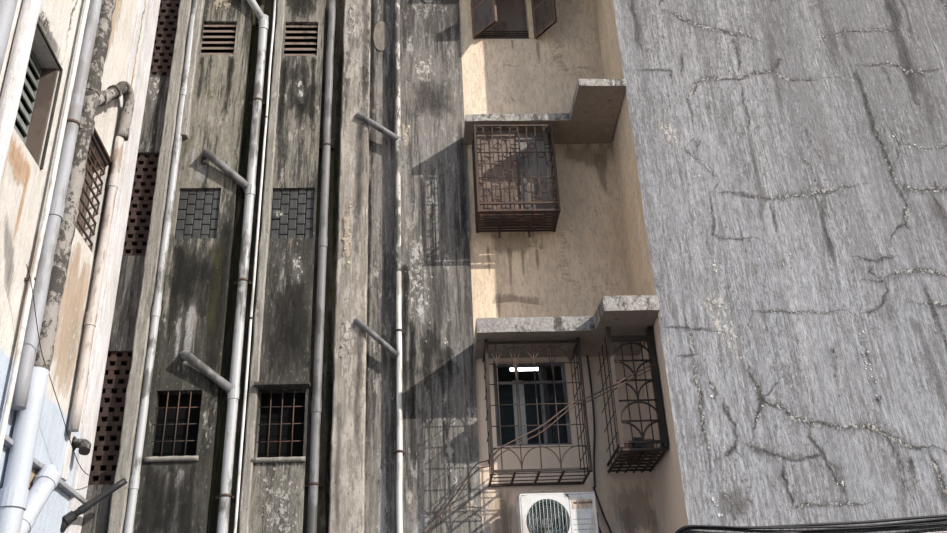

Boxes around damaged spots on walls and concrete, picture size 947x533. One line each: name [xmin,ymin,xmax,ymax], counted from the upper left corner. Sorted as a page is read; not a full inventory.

leakage [224,57,234,110]
leakage [243,92,254,180]
leakage [278,57,317,141]
leakage [358,0,375,170]
crack [646,0,838,240]
crack [871,120,947,231]
leakage [358,180,372,426]
crack [749,308,834,329]
crack [864,257,947,345]
leakage [167,219,233,533]
crack [671,320,947,508]
crack [711,493,739,517]